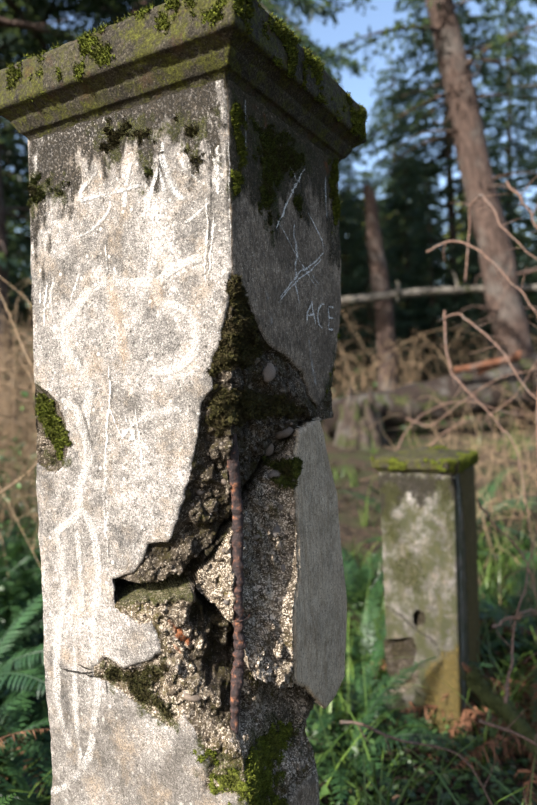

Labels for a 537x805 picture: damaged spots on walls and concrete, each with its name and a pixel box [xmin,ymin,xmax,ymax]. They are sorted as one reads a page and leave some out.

water stain [28,78,341,270]
spalling [119,298,334,583]